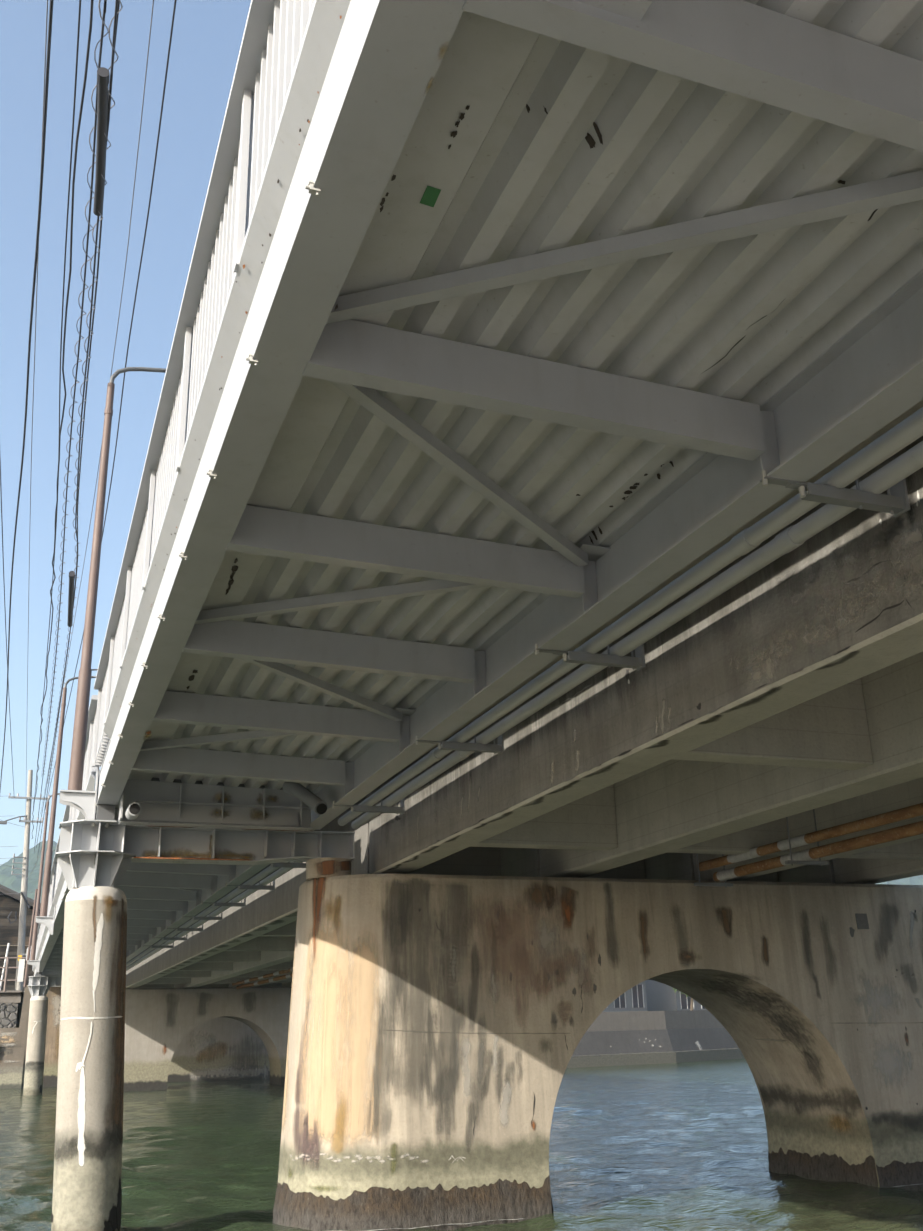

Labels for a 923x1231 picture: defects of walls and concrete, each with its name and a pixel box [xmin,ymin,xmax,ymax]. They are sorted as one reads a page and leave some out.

peeling [585,122,603,149]
water stain [699,490,923,724]
water stain [527,732,616,806]
corrosion [312,860,350,954]
corrosion [527,883,575,926]
water stain [606,884,617,962]
water stain [640,911,649,960]
water stain [717,908,732,936]
water stain [282,835,511,1163]
water stain [54,913,127,1166]
water stain [759,1087,861,1115]
water stain [872,1112,923,1129]